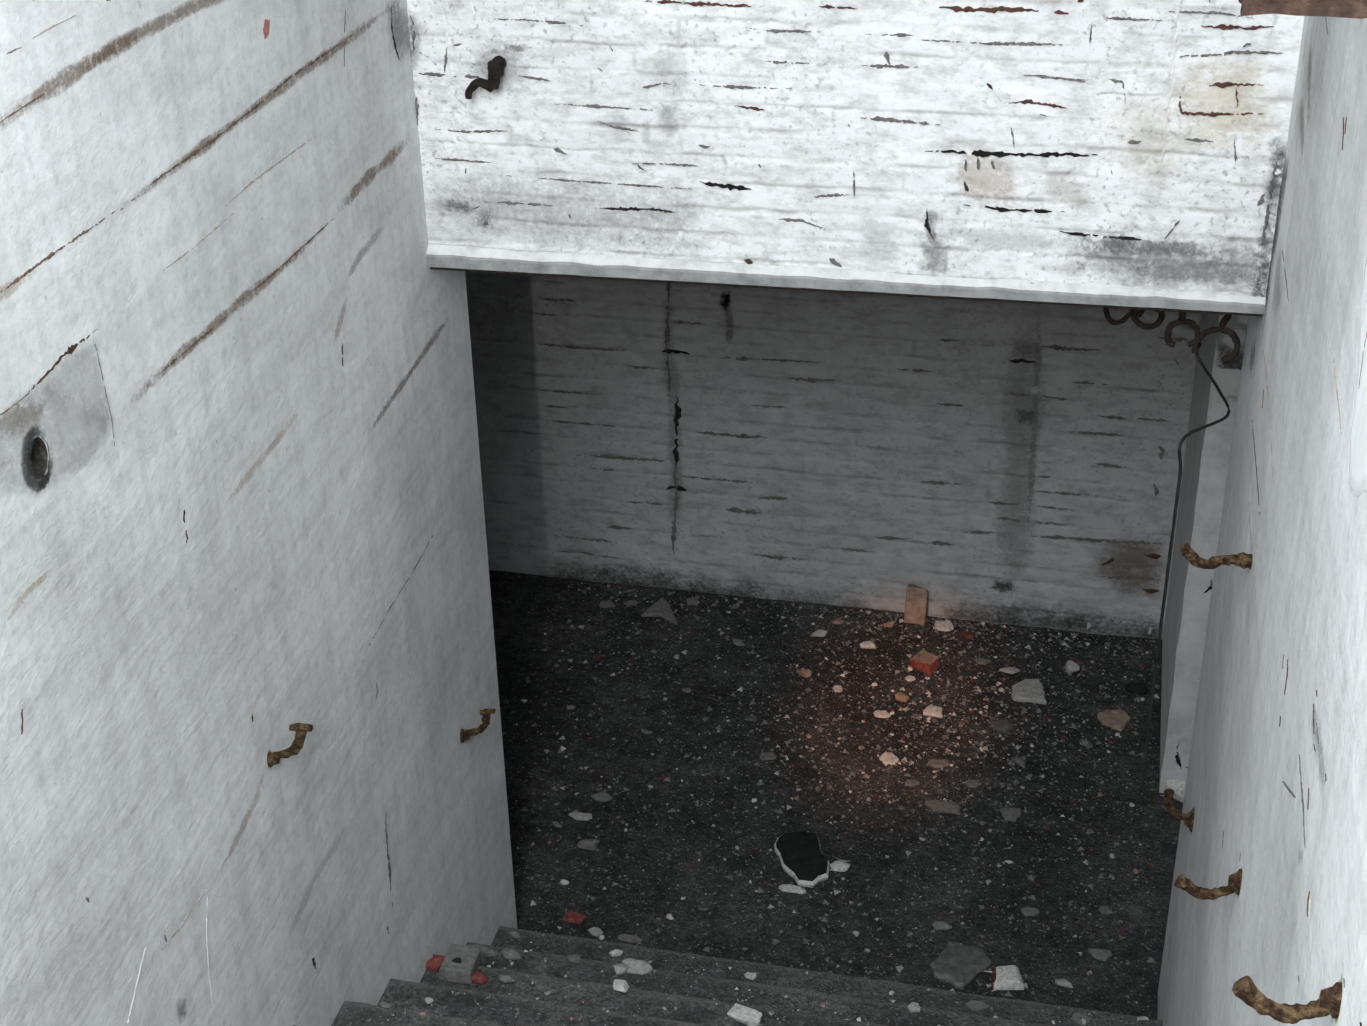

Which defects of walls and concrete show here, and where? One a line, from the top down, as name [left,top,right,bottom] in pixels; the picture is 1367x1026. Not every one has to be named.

rust [2,0,215,124]
rust [1,19,372,292]
flaking render [0,329,115,446]
crack [662,283,690,554]